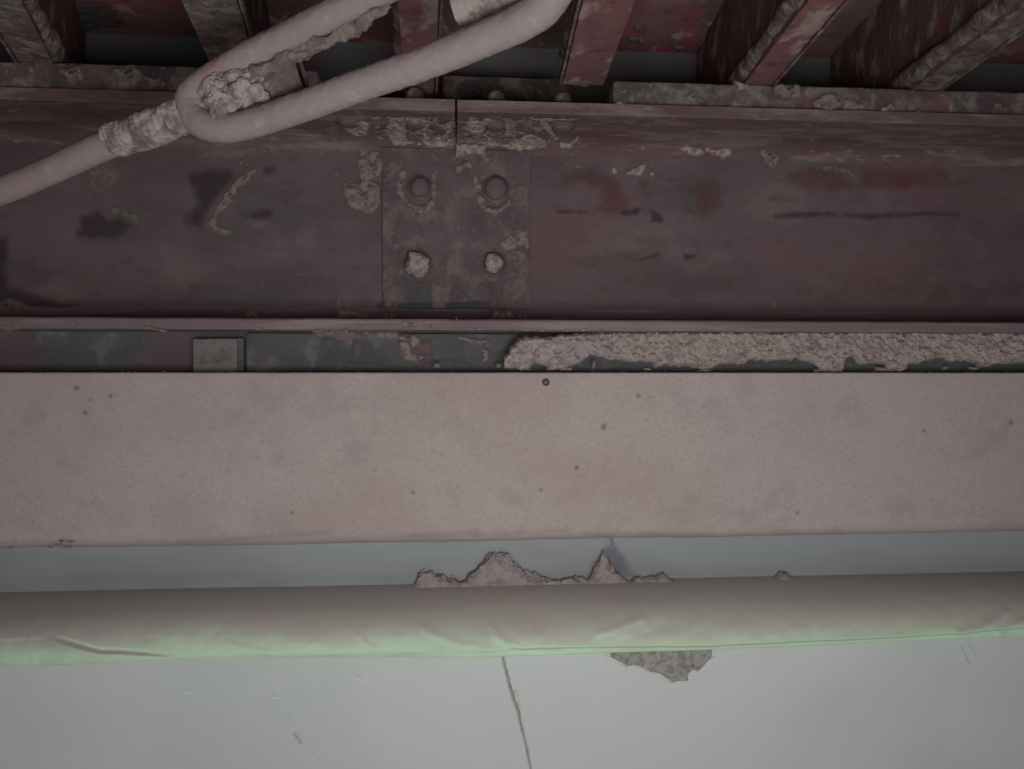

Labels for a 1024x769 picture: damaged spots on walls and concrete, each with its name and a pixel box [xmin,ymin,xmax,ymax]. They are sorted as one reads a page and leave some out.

peeling [314,120,438,217]
peeling [386,117,579,216]
peeling [499,229,530,300]
peeling [338,311,395,319]
spalling [323,318,1024,373]
spalling [607,650,715,684]
crack [502,657,531,769]